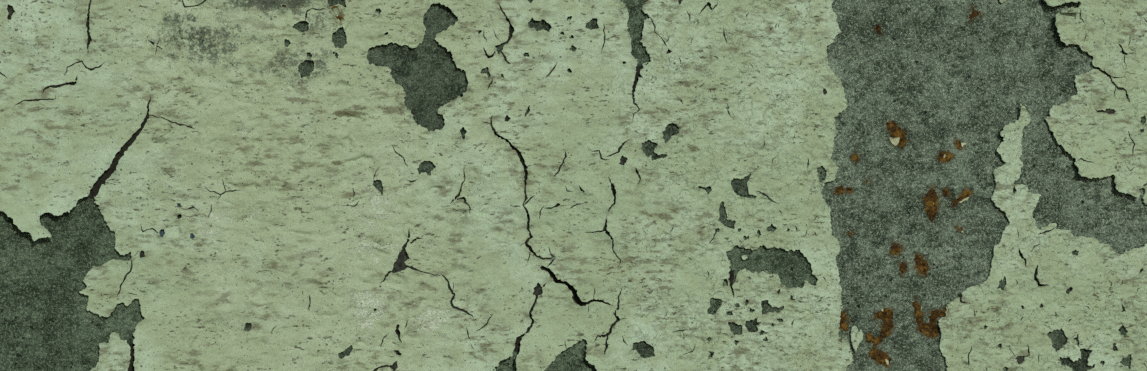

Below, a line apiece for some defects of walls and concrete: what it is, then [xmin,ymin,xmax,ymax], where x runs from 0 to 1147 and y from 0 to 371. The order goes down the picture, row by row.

peeling [367,3,468,131]
peeling [0,63,150,371]
crack [87,95,195,200]
crack [117,226,197,371]
crack [380,231,492,349]
crack [482,3,713,357]
peeling [707,202,817,345]
rust [865,308,894,367]
rust [889,243,929,276]
rust [913,300,949,338]
rust [923,188,971,221]
peeling [817,0,1147,371]